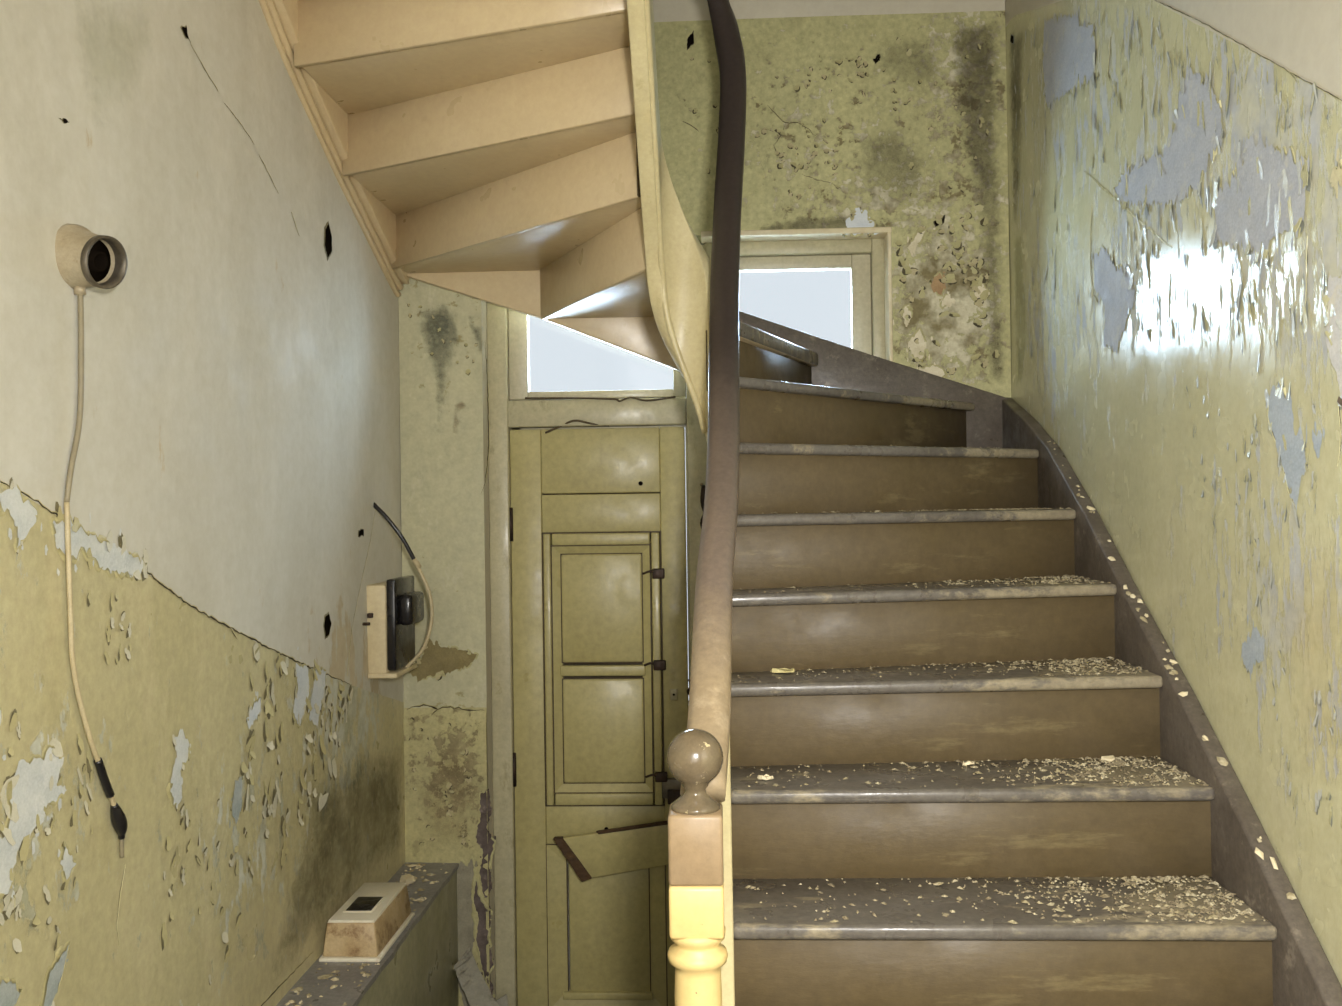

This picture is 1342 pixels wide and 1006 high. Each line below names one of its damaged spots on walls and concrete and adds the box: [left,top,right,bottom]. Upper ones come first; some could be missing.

peeling [842,206,878,237]
damp [426,312,454,376]
peeling [1276,251,1342,410]
peeling [0,477,149,665]
spalling [323,612,332,639]
spalling [409,639,479,682]
peeling [1200,378,1325,721]
peeling [0,707,94,1006]
peeling [161,641,353,962]
flaking render [399,874,417,885]
peeling [405,717,496,999]